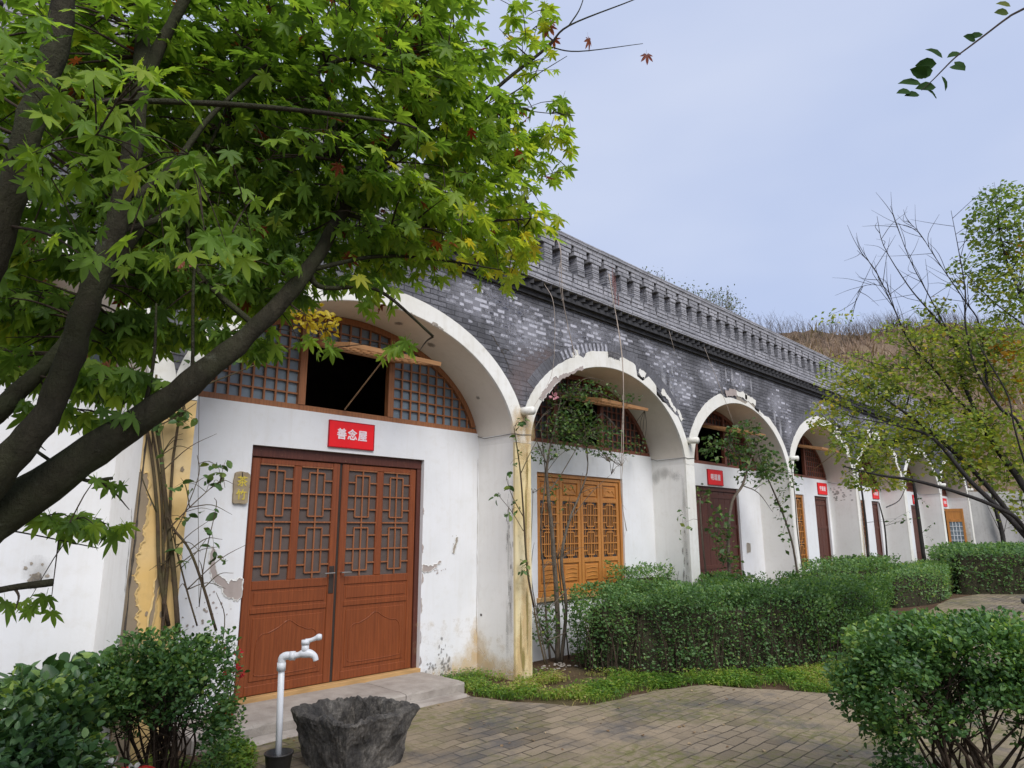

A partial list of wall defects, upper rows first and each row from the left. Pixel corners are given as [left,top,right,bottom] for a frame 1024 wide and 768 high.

flaking render [539,349,584,401]
flaking render [661,389,684,421]
peeling [119,471,172,664]
flaking render [182,546,244,627]
flaking render [422,544,442,583]
peeling [108,717,136,768]